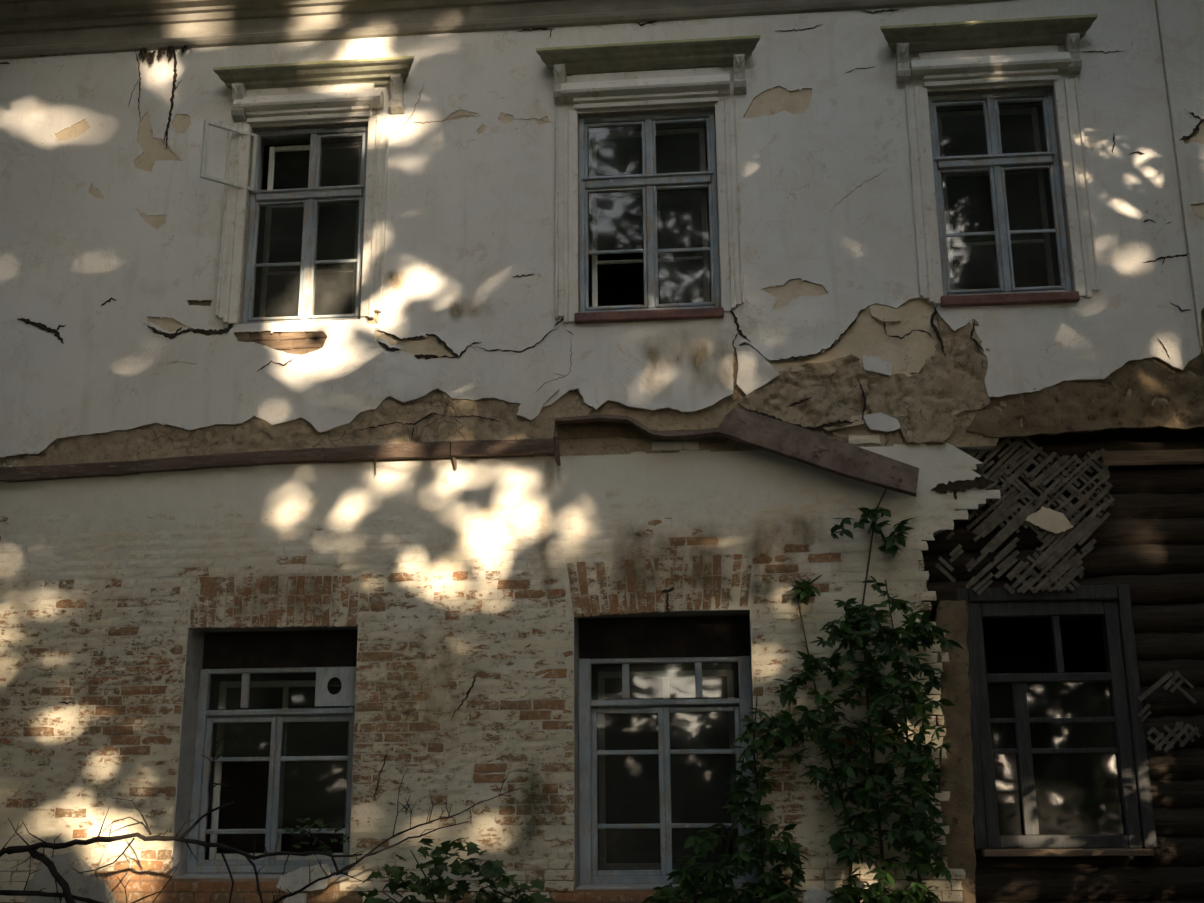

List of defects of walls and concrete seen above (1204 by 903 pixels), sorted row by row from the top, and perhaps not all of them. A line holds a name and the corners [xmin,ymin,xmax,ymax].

crack [128,49,182,149]
flaking render [743,86,812,118]
flaking render [135,110,191,172]
crack [1177,112,1204,140]
crack [1141,216,1187,265]
flaking render [762,277,827,310]
flaking render [148,316,187,334]
flaking render [234,320,327,355]
flaking render [365,312,455,359]
flaking render [738,298,1204,444]
flaking render [5,389,594,467]
crack [450,677,476,722]